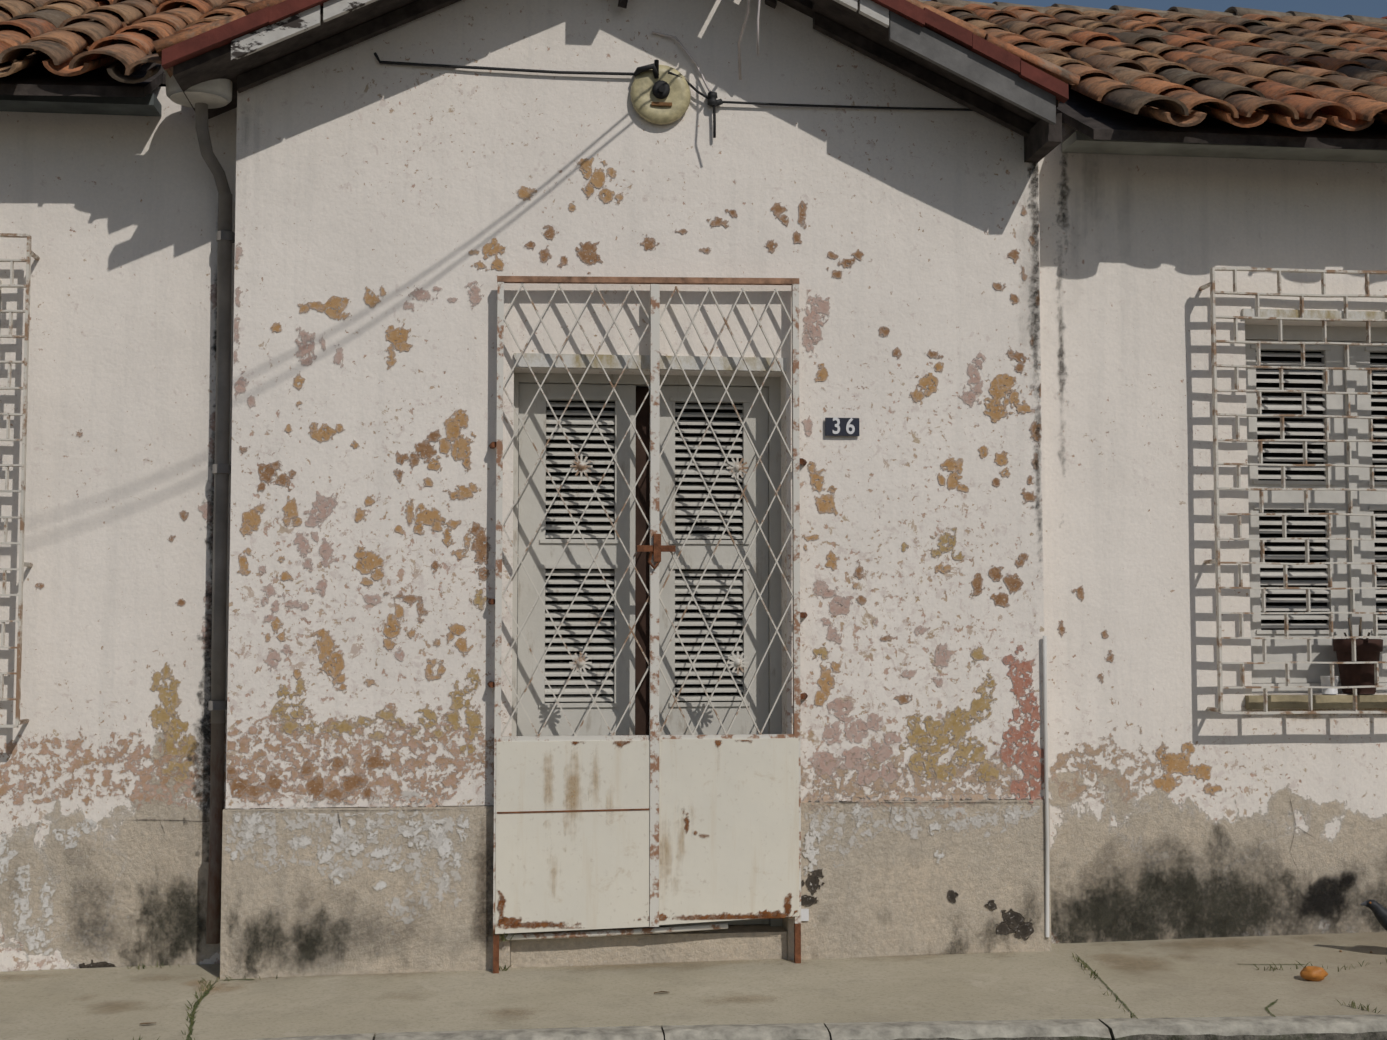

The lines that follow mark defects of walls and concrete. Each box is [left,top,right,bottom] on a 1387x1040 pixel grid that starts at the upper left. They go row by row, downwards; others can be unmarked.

peeling [270,285,386,409]
peeling [384,238,506,370]
peeling [937,335,1042,504]
peeling [393,409,491,610]
peeling [0,461,494,968]
peeling [801,527,1387,943]
water stain [143,881,202,964]
water stain [247,915,336,963]
rust [495,891,580,929]
rust [638,893,798,921]
water stain [1058,870,1271,942]
water stain [1300,873,1355,917]